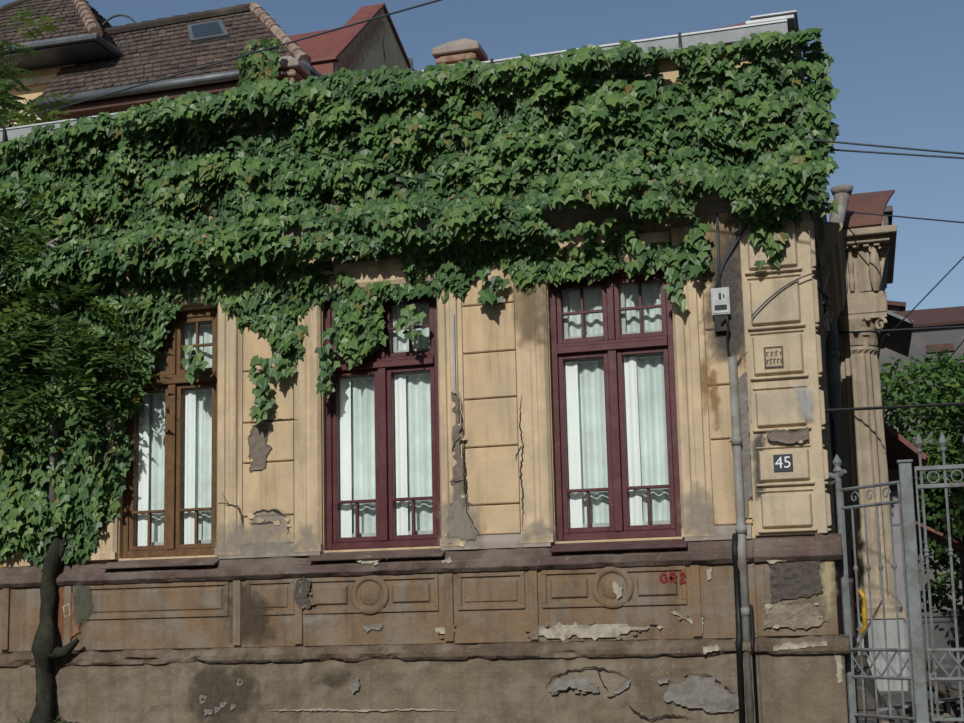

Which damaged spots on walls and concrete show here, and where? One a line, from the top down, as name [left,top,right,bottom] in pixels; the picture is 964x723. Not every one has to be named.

spalling [246,420,272,471]
spalling [444,390,476,547]
peeling [248,513,292,533]
spalling [763,560,823,630]
peeling [524,620,663,643]
peeling [773,641,843,683]